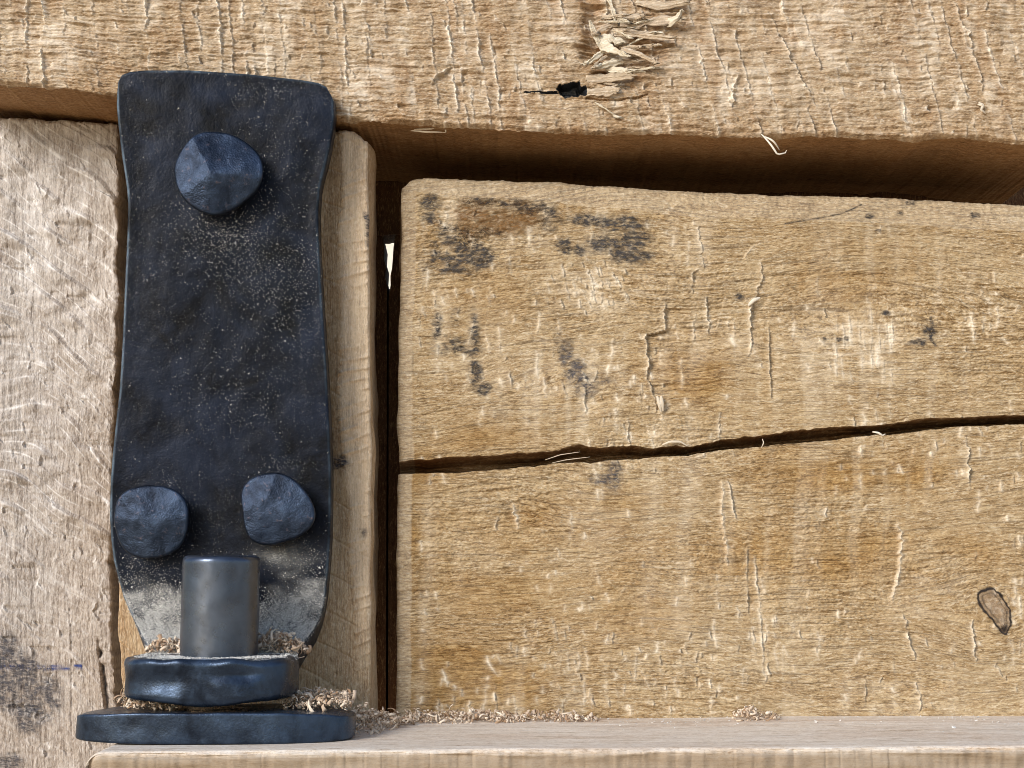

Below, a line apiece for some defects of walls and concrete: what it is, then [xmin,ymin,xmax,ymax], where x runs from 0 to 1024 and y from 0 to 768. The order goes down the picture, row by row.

spalling [572,0,692,90]
leakage [421,194,560,274]
leakage [556,215,651,264]
crack [399,415,1024,474]